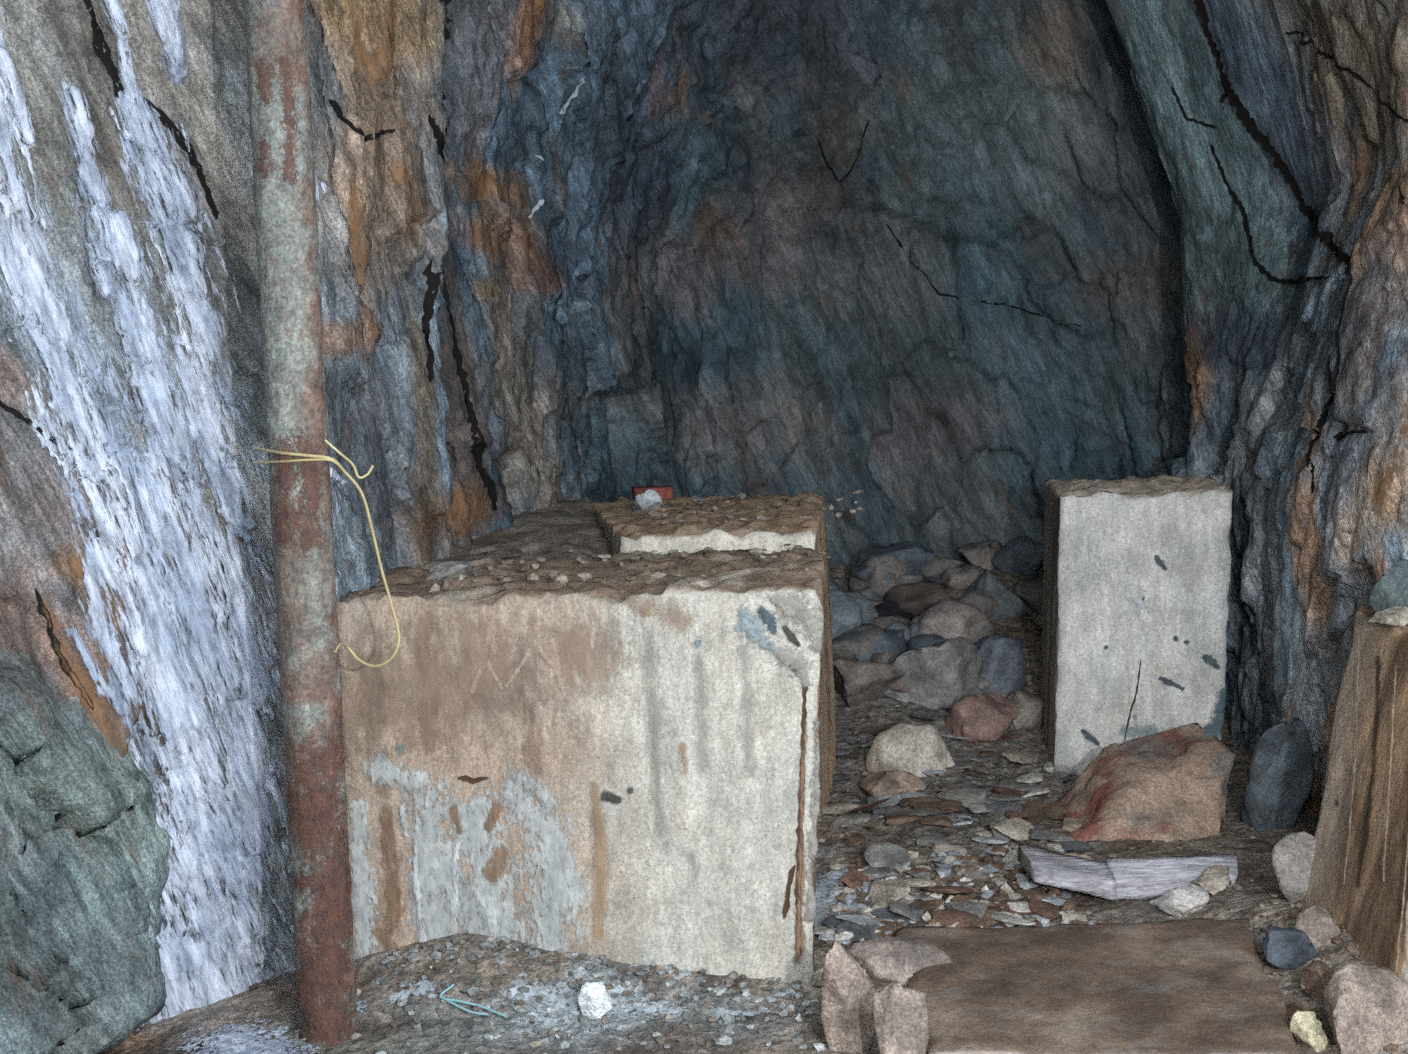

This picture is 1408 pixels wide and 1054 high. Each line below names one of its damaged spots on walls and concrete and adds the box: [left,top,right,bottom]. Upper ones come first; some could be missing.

rust [257,55,301,186]
rust [269,427,327,558]
damp [343,613,622,759]
damp [625,595,702,647]
rust [284,726,358,1048]
damp [374,776,427,951]
damp [450,802,509,937]
damp [385,978,436,1005]
damp [500,978,691,1023]
damp [711,1005,788,1019]